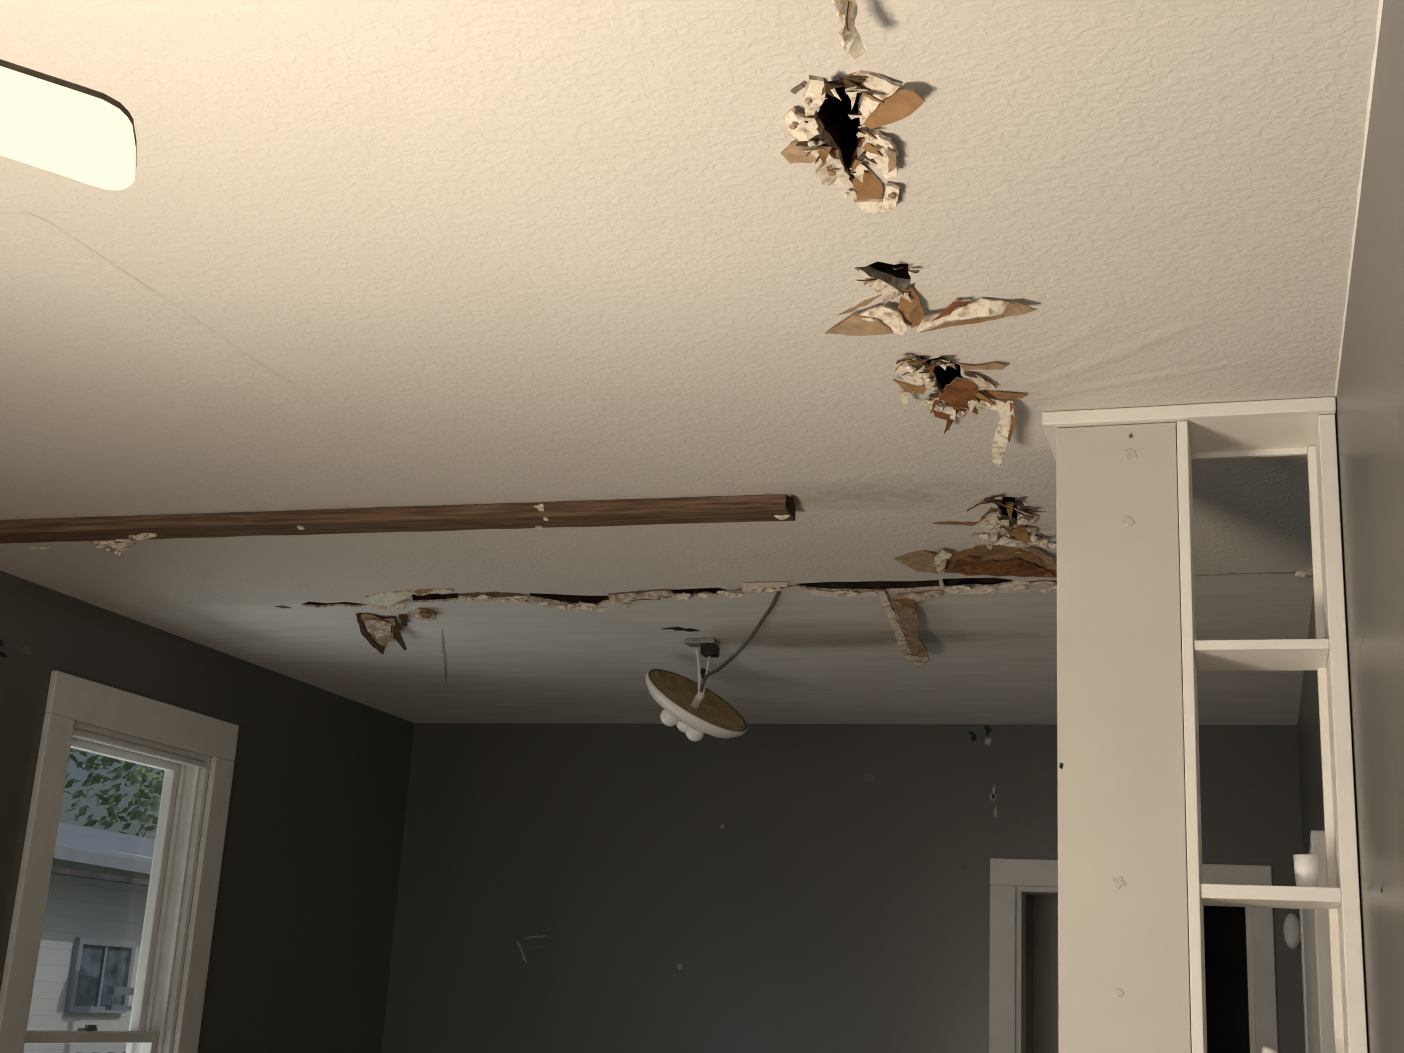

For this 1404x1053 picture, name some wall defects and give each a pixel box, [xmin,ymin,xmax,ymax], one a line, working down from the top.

spalling [783,70,900,214]
spalling [855,261,913,335]
spalling [895,354,1006,420]
flaking render [977,497,1050,550]
flaking render [934,549,952,575]
crack [1195,569,1313,578]
crack [275,578,1057,684]